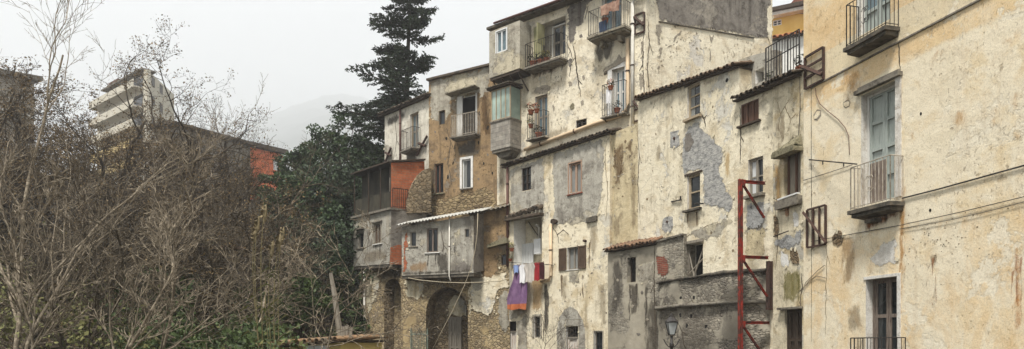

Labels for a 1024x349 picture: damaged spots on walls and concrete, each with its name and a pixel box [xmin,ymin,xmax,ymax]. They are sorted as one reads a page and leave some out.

crack [566,42,582,96]
spalling [678,121,735,216]